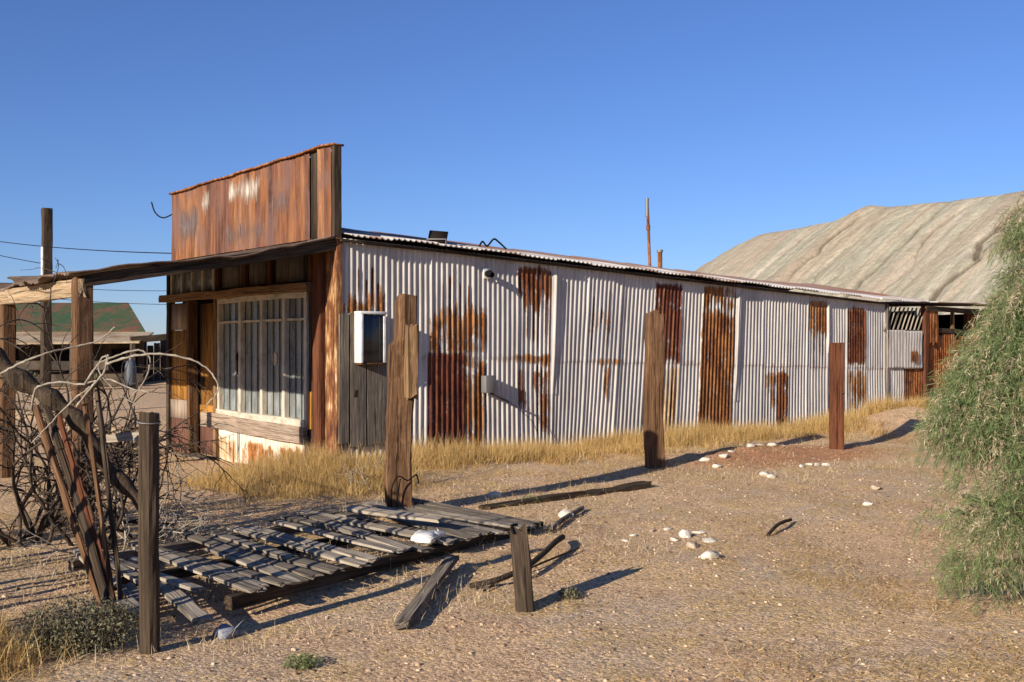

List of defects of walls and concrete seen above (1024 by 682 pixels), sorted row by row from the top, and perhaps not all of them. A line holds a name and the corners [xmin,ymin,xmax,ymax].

rust [171,146,331,261]
rust [428,266,487,451]
rust [515,265,551,435]
rust [655,284,683,432]
rust [698,286,736,433]
rust [766,366,788,429]
rust [808,301,827,362]
rust [847,306,866,410]